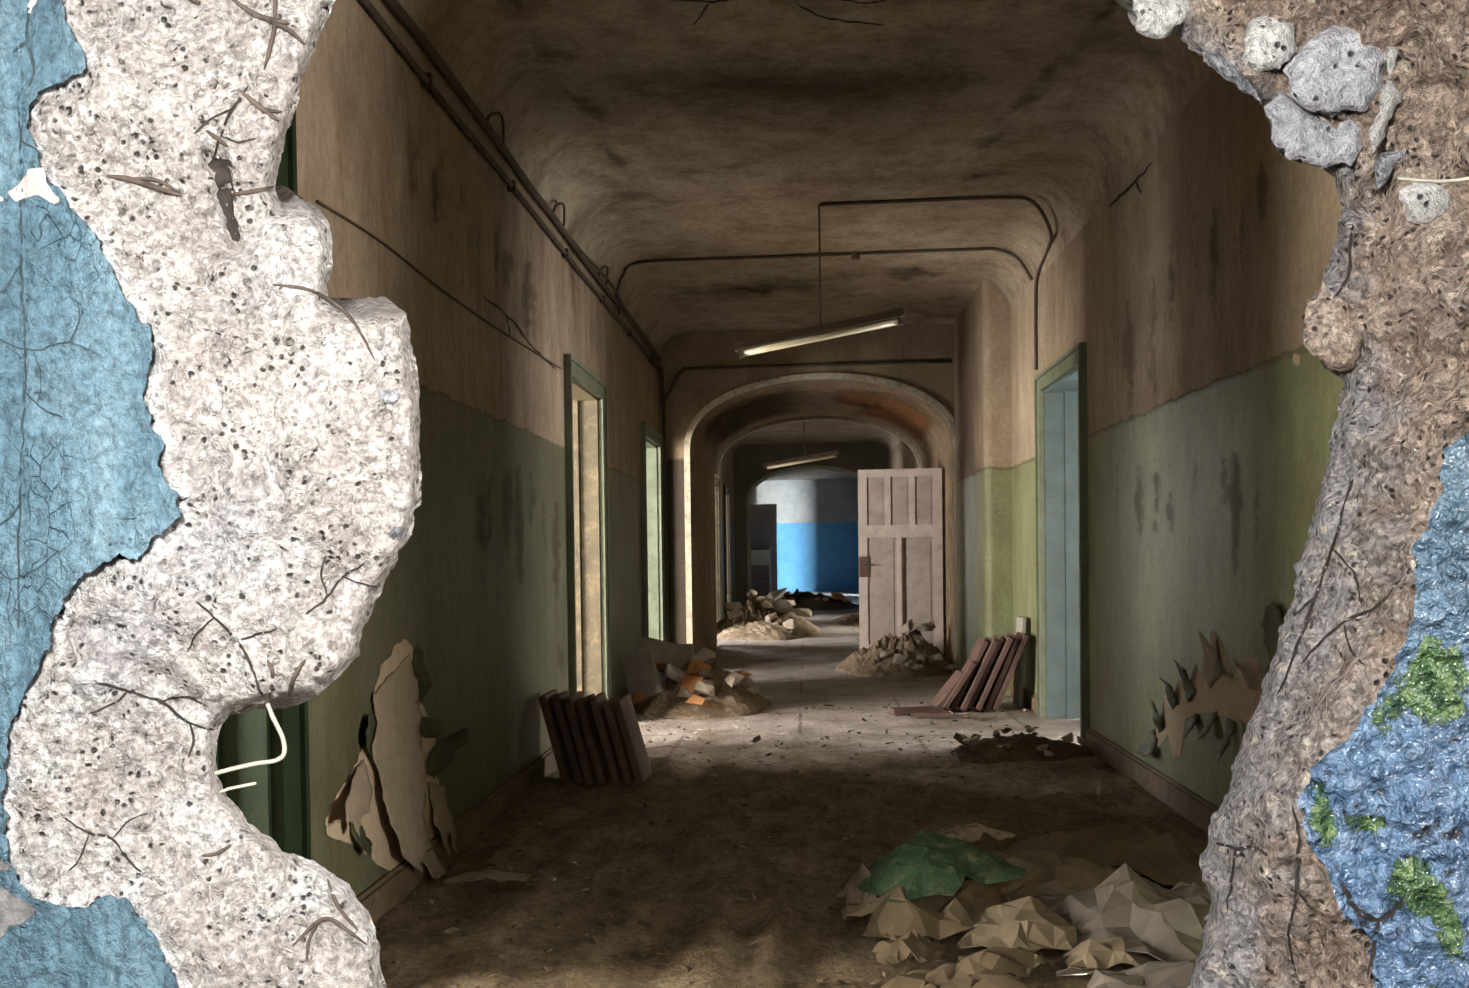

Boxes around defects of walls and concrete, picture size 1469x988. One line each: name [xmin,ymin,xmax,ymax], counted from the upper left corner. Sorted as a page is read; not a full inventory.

crack [676,0,729,25]
crack [796,0,886,26]
crack [195,85,256,160]
spalling [0,0,422,988]
spalling [1116,0,1469,988]
crack [187,556,377,697]
crack [1276,479,1401,696]
crack [90,682,215,758]
peeling [325,639,470,879]
crack [62,813,153,881]